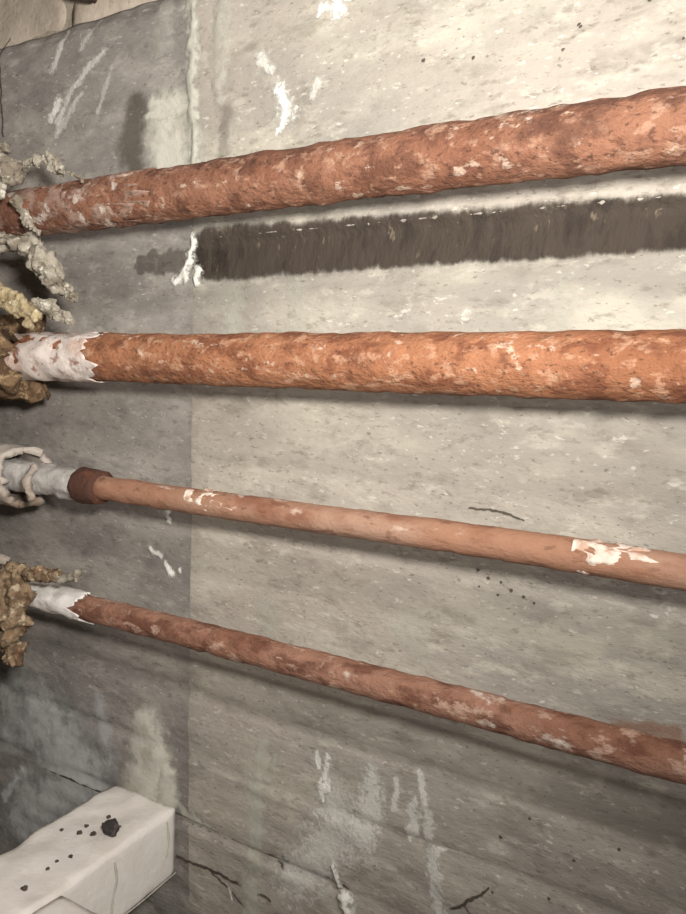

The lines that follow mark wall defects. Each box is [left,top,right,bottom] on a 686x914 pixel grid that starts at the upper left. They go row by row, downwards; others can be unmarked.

damp [316,0,352,20]
damp [50,31,71,73]
damp [48,51,105,125]
damp [256,52,298,137]
damp [310,77,322,99]
damp [122,95,145,170]
damp [242,739,475,914]
crack [176,855,271,908]
crack [449,887,489,914]